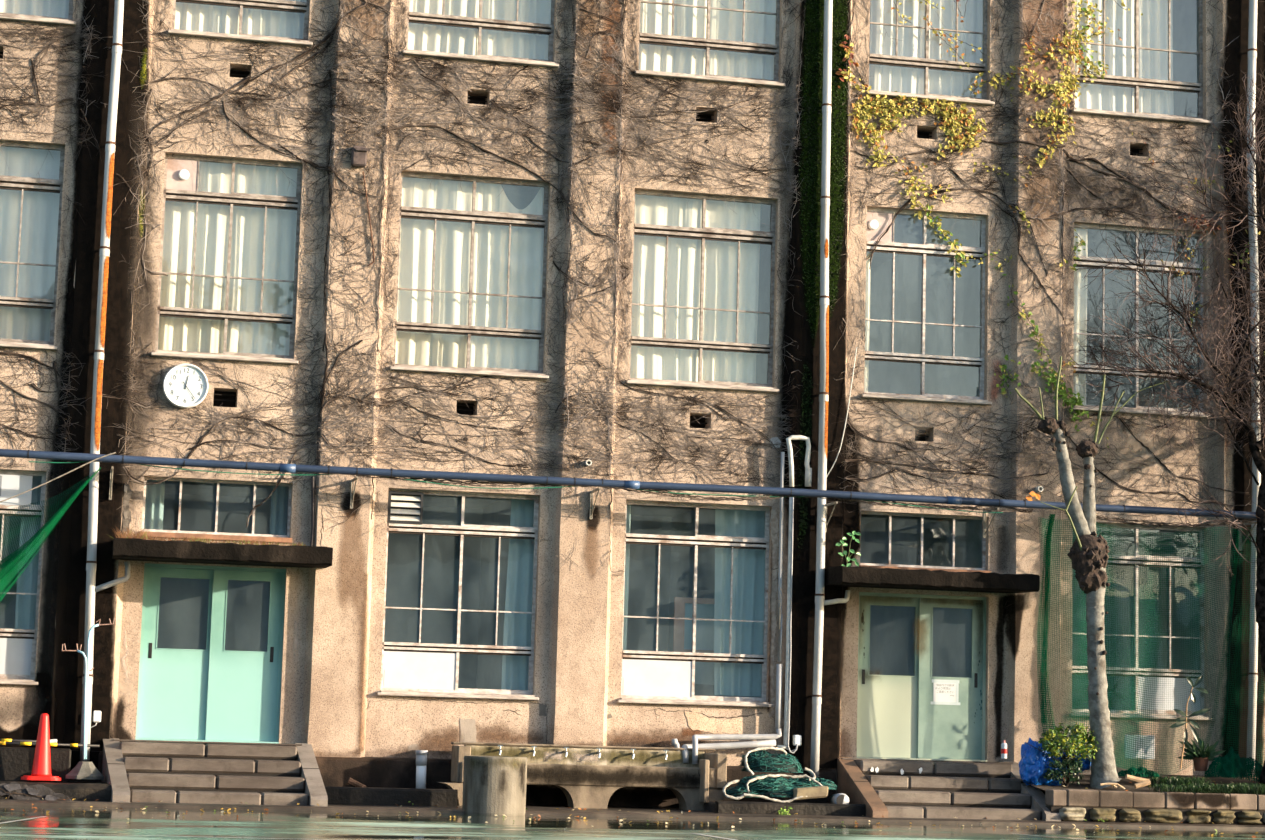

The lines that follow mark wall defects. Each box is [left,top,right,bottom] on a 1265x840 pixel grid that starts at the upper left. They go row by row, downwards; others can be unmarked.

leakage [1122,435,1153,475]
leakage [1218,0,1265,777]